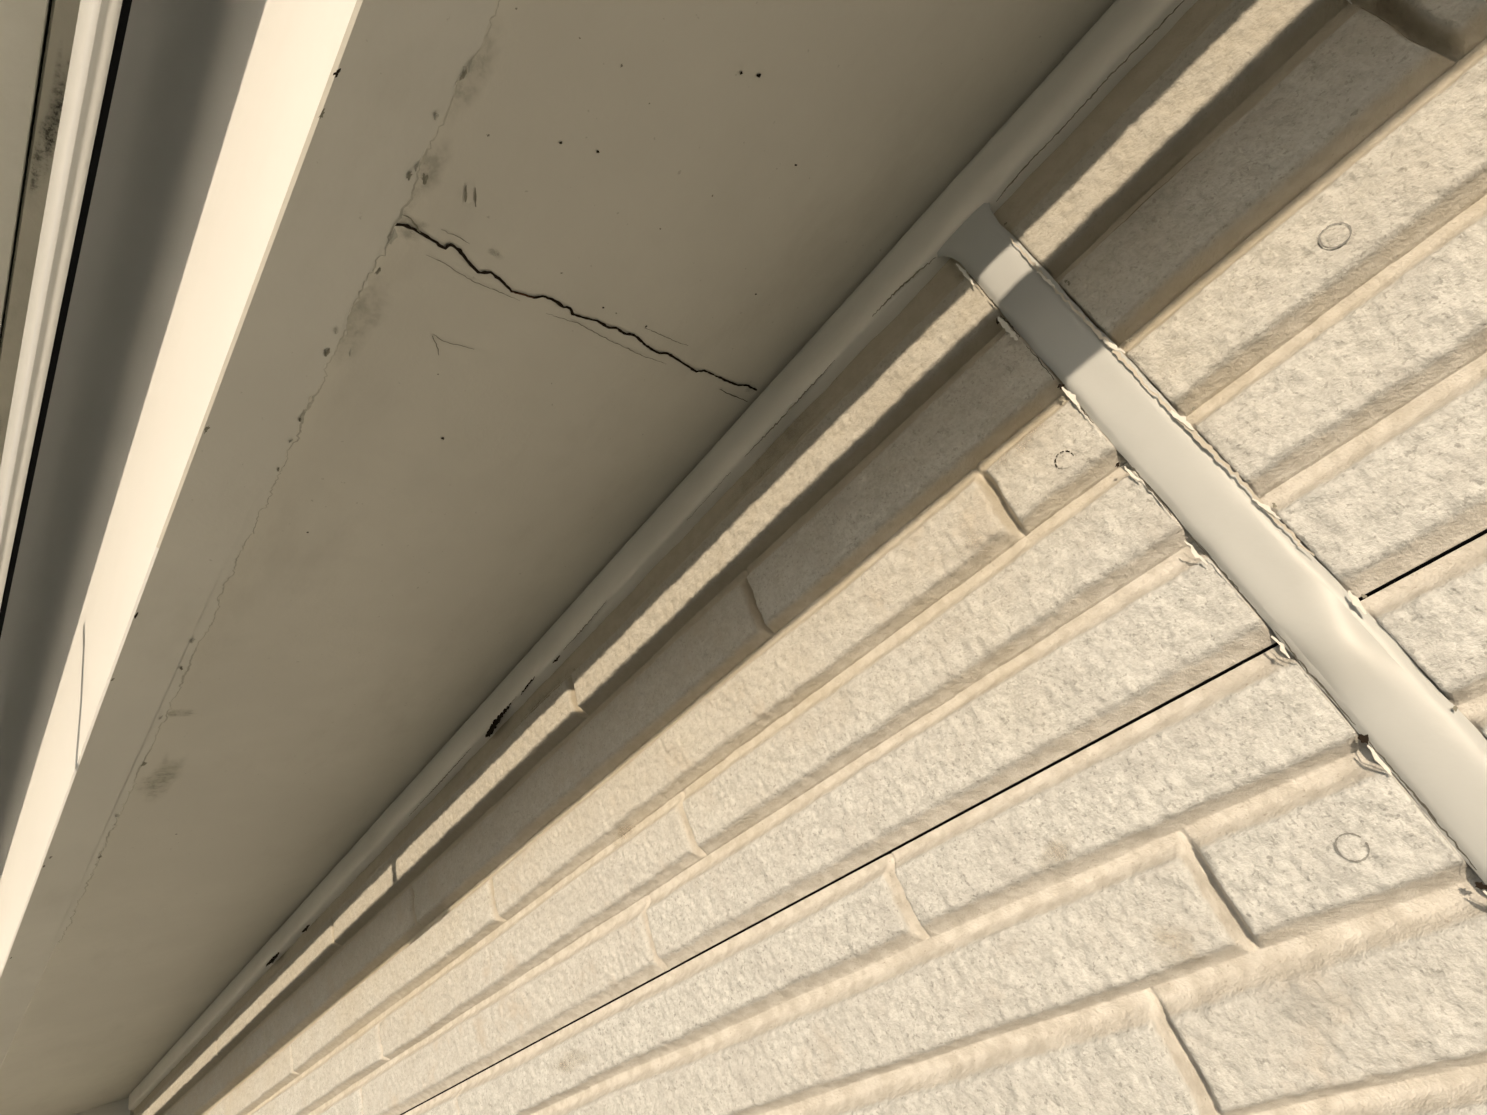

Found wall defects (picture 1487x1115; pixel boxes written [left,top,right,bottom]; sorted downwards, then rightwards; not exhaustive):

crack [395,215,757,402]